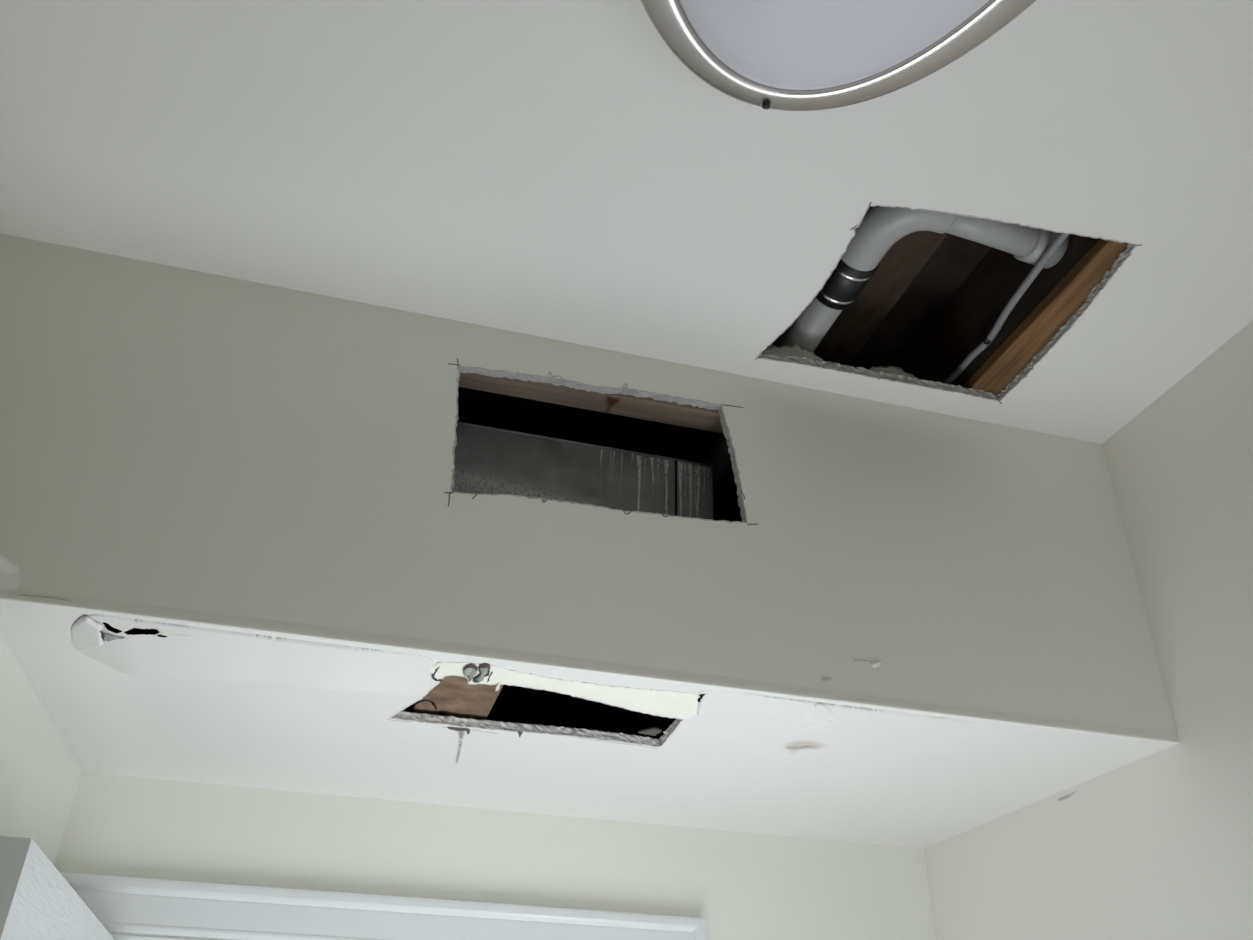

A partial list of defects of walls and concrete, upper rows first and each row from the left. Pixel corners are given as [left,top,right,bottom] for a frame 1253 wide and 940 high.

spalling [713,503,742,522]
spalling [103,622,161,635]
spalling [431,662,711,739]